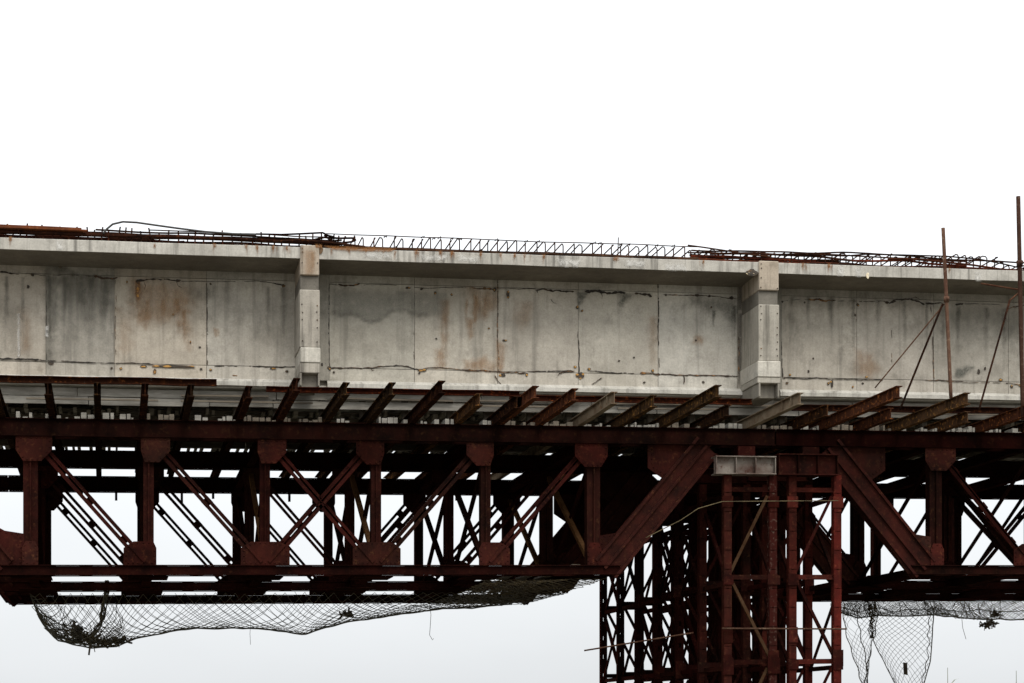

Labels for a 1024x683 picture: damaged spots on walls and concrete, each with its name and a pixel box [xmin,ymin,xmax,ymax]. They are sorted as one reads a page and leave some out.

crack [328,279,740,384]